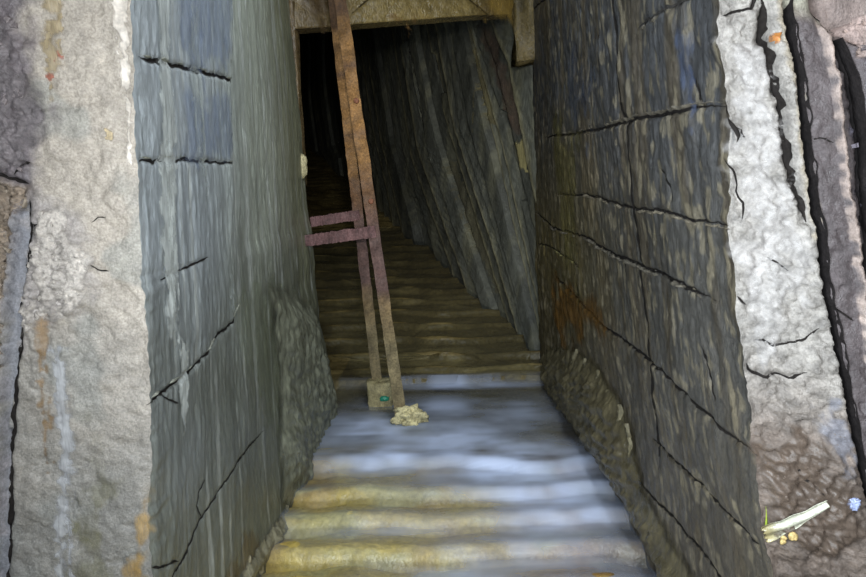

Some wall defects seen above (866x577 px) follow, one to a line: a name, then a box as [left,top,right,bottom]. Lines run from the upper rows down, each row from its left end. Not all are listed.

peeling [0,16,45,172]
spalling [829,14,866,58]
spalling [0,183,28,298]
crack [536,0,759,544]
crack [723,0,866,498]
crack [6,302,24,577]
water stain [47,346,75,577]
crack [152,431,263,577]
crack [640,481,721,577]